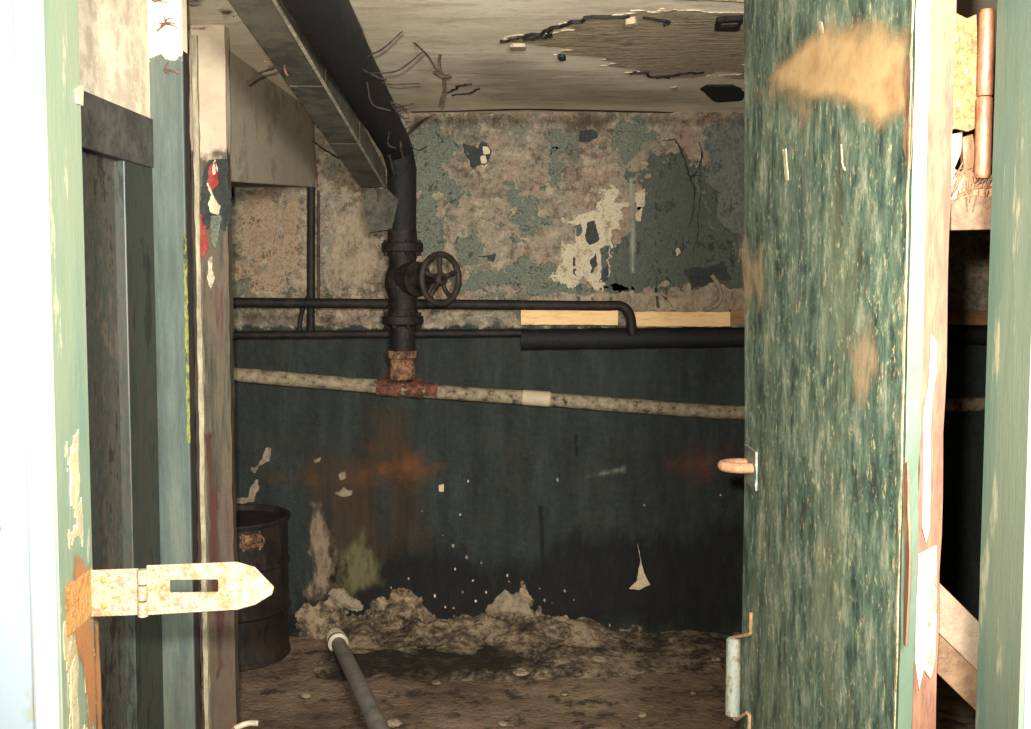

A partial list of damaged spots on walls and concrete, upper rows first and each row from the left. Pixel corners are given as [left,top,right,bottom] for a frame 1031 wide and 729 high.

flaking render [200,159,302,293]
peeling [408,8,745,313]
spalling [65,429,84,550]
spalling [63,621,102,729]